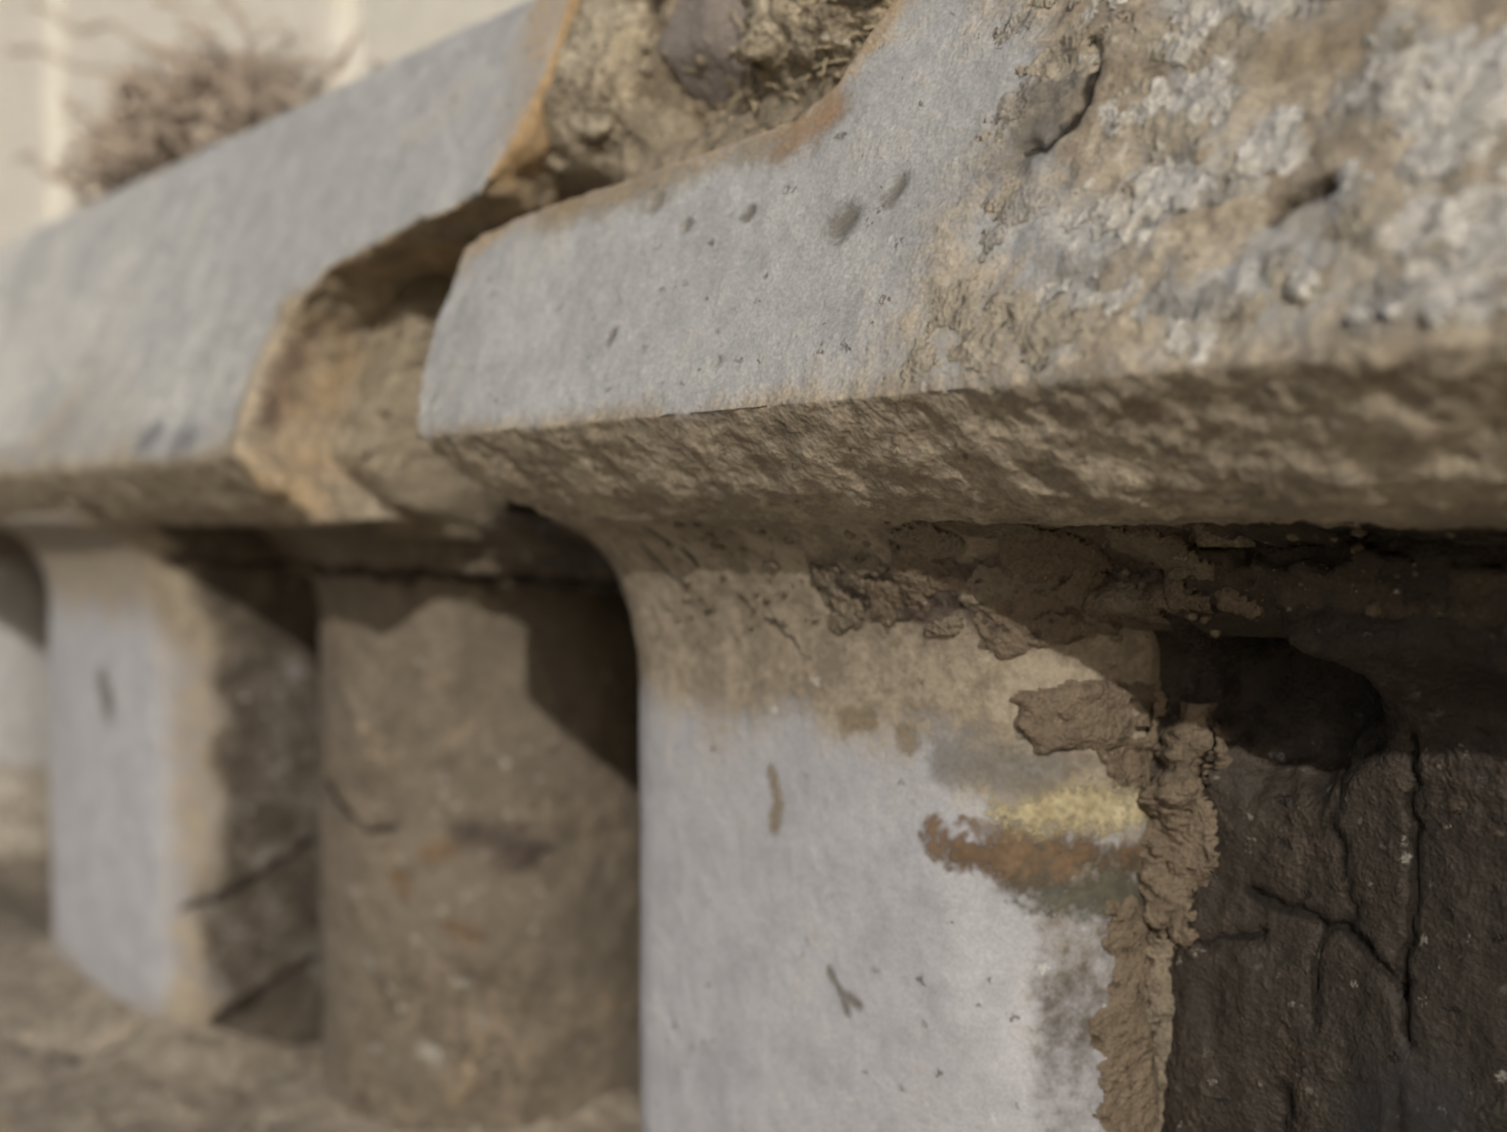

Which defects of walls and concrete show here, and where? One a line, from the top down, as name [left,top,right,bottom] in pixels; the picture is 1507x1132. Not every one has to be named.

peeling [976,0,1274,262]
damp [1058,0,1507,328]
peeling [895,278,1102,403]
damp [1036,264,1148,323]
damp [1162,318,1218,365]
peeling [1140,136,1507,350]
spalling [806,520,1264,660]
crack [178,837,316,912]
corrosion [919,785,1150,921]
peeling [1009,677,1233,1132]
crack [1194,735,1423,1049]
crack [209,954,317,1027]